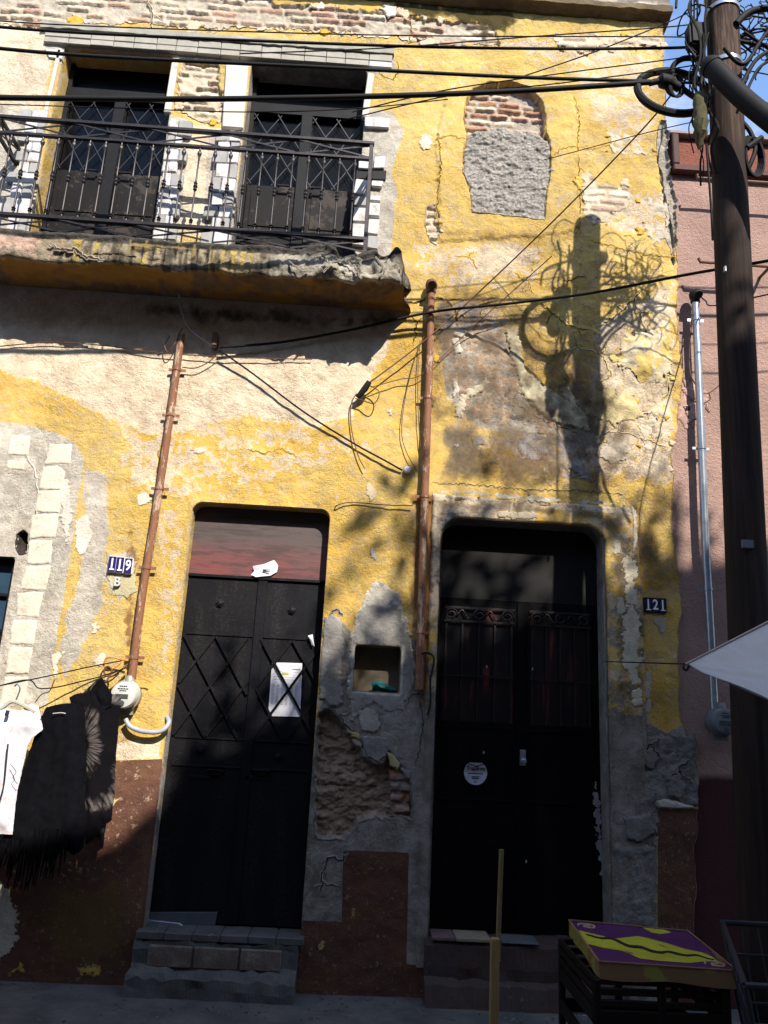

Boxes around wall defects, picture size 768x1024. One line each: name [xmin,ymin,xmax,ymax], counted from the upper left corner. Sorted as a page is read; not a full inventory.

spalling [0,0,501,46]
spalling [424,204,444,244]
crack [435,132,478,268]
spalling [433,120,710,736]
peeling [59,479,93,555]
rust [411,494,433,700]
peeling [49,650,65,679]
spalling [311,614,413,841]
peeling [655,756,699,820]
crack [313,853,349,896]